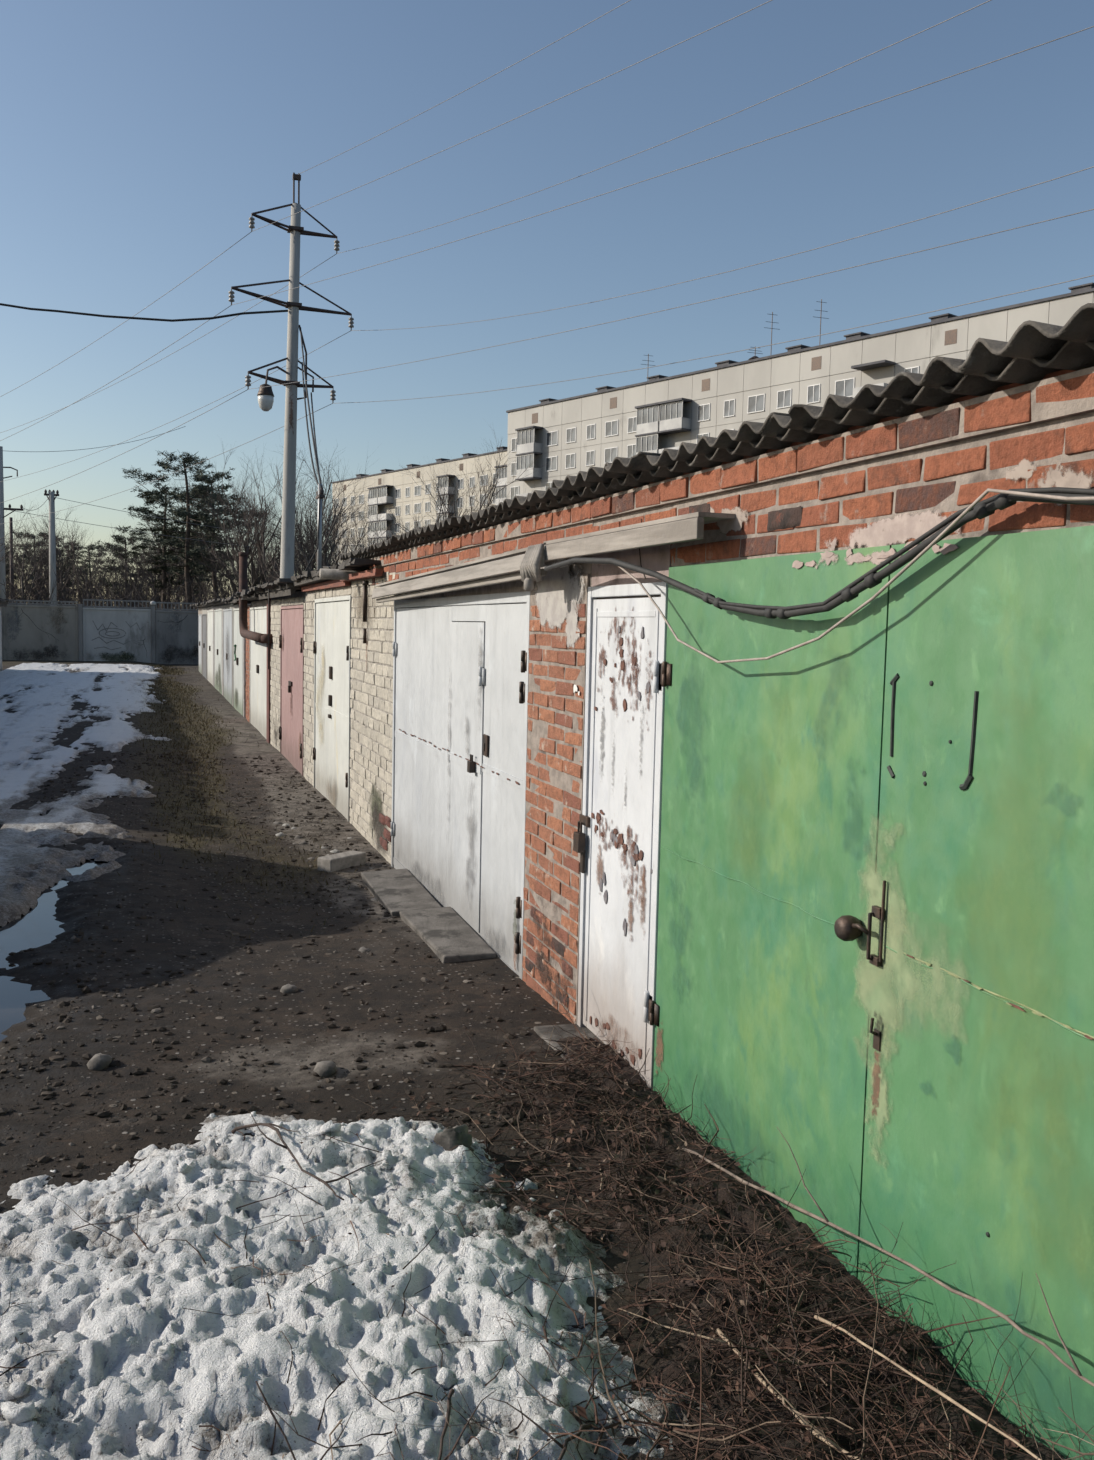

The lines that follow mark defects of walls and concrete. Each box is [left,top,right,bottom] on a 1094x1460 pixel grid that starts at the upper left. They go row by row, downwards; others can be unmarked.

peeling [792,509,960,569]
corrosion [594,609,653,721]
corrosion [589,810,653,940]
corrosion [872,1051,880,1115]